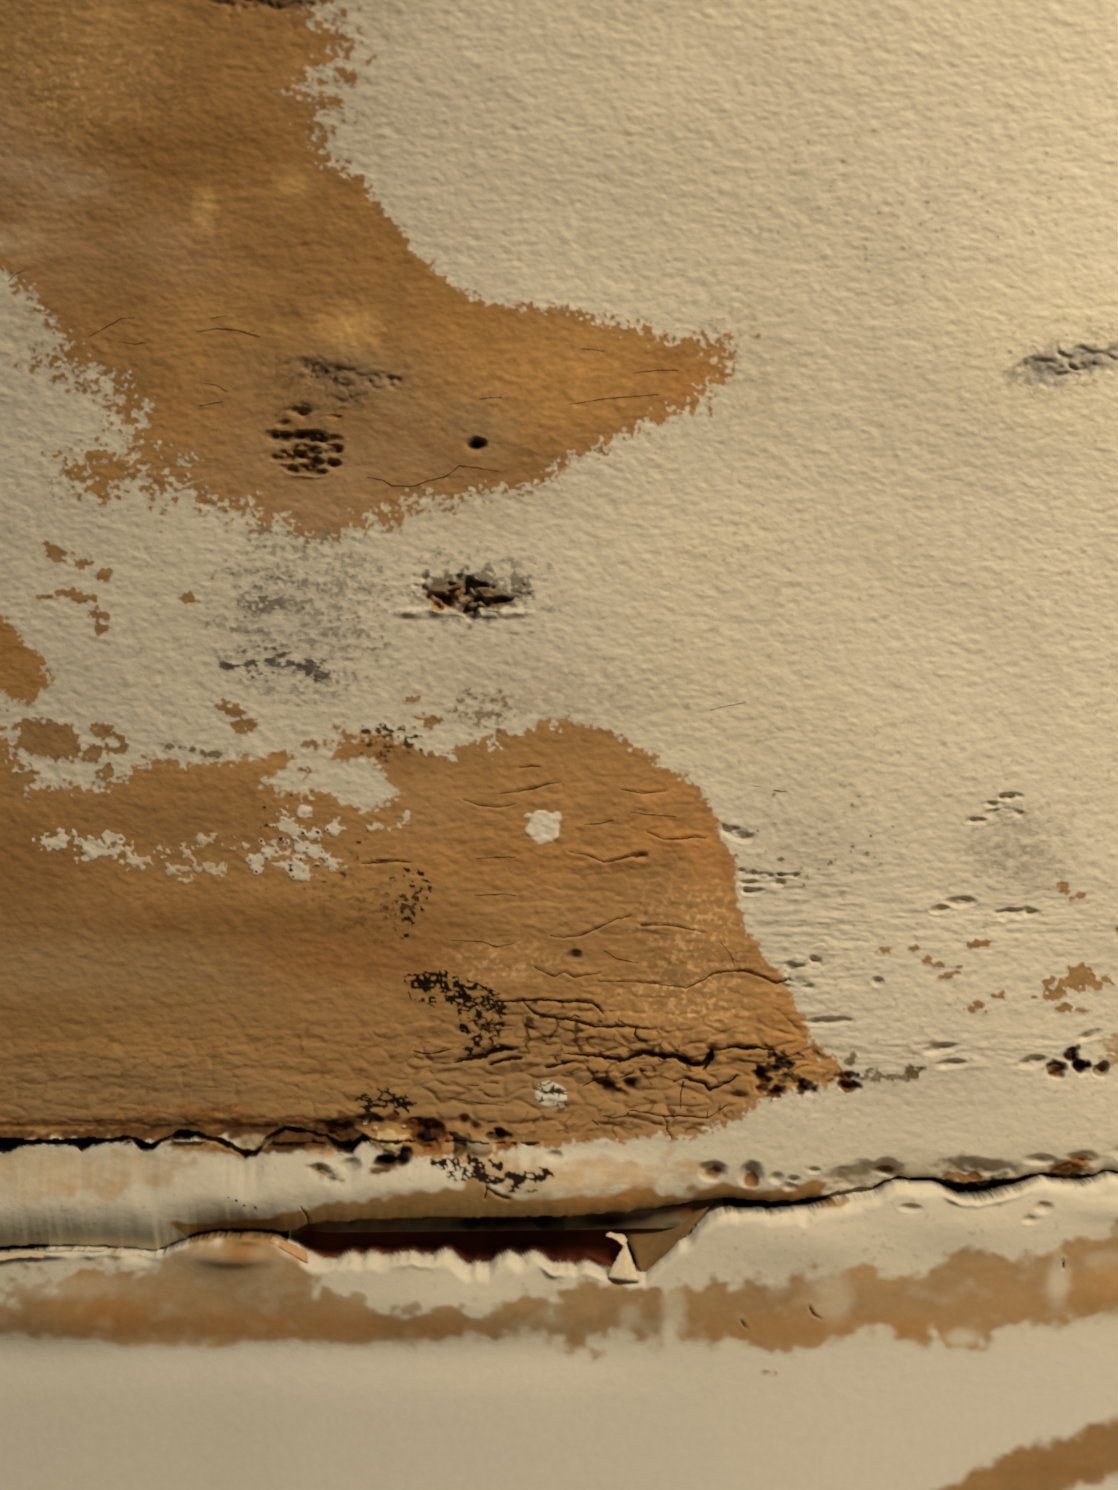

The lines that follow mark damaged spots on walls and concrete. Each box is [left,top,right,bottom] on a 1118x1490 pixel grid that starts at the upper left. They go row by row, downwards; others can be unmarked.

spalling [1003,315,1118,398]
spalling [255,353,418,478]
peeling [0,716,131,790]
peeling [160,815,348,884]
peeling [1031,961,1116,1014]
crack [0,916,788,1199]
crack [0,1244,49,1254]
crack [163,1208,309,1254]
spalling [269,1156,926,1282]
crack [723,1196,833,1216]
crack [877,1169,1118,1203]
leakage [928,1412,1118,1490]